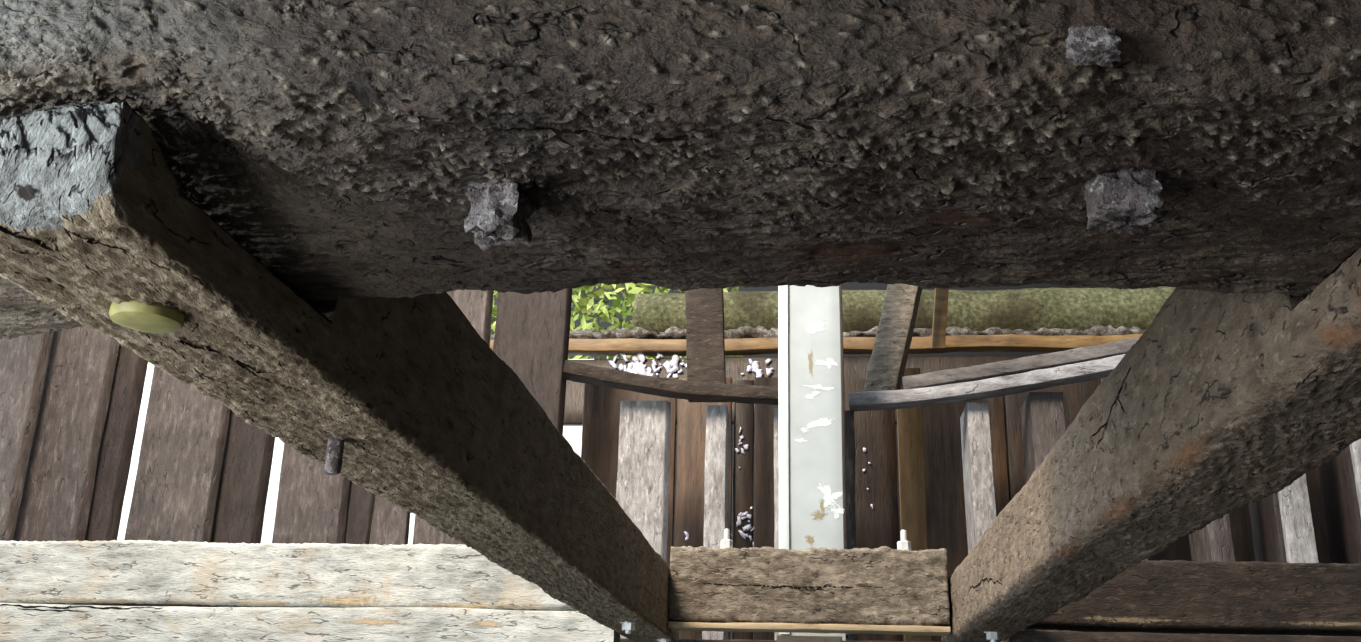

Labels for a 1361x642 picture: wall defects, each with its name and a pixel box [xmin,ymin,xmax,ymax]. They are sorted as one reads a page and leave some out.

crack [1090,367,1131,448]
crack [969,577,1002,591]